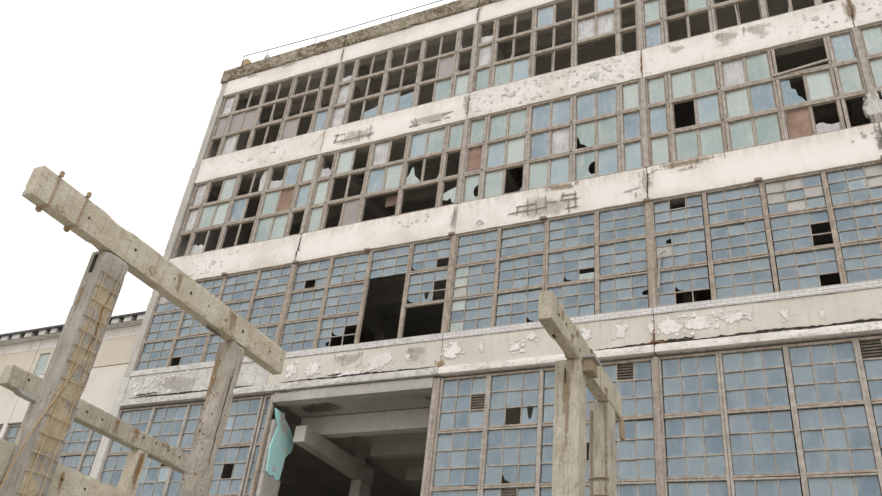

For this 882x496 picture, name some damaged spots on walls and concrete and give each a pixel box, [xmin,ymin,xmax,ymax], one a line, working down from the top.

spalling [508,191,579,216]
spalling [571,308,882,354]
spalling [280,352,431,383]